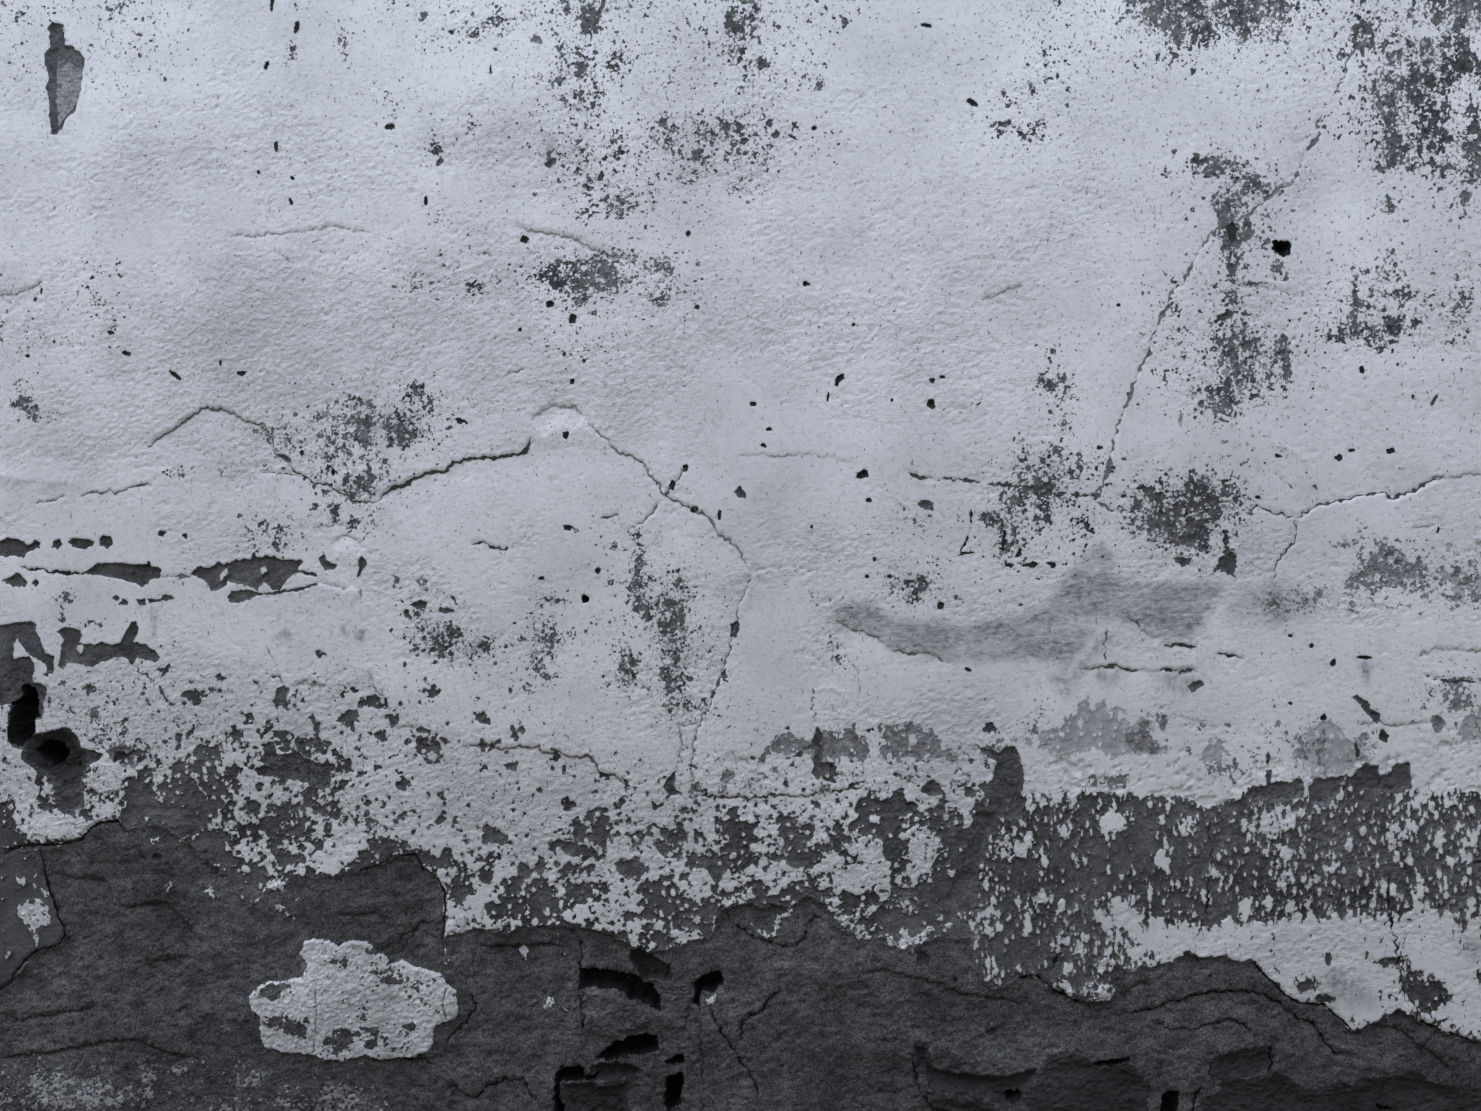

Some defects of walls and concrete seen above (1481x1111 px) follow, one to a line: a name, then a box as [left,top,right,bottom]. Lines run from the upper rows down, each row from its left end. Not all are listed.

peeling [0,258,131,428]
crack [37,404,862,800]
crack [908,32,1371,553]
crack [1248,447,1481,580]
spalling [0,512,1481,1111]